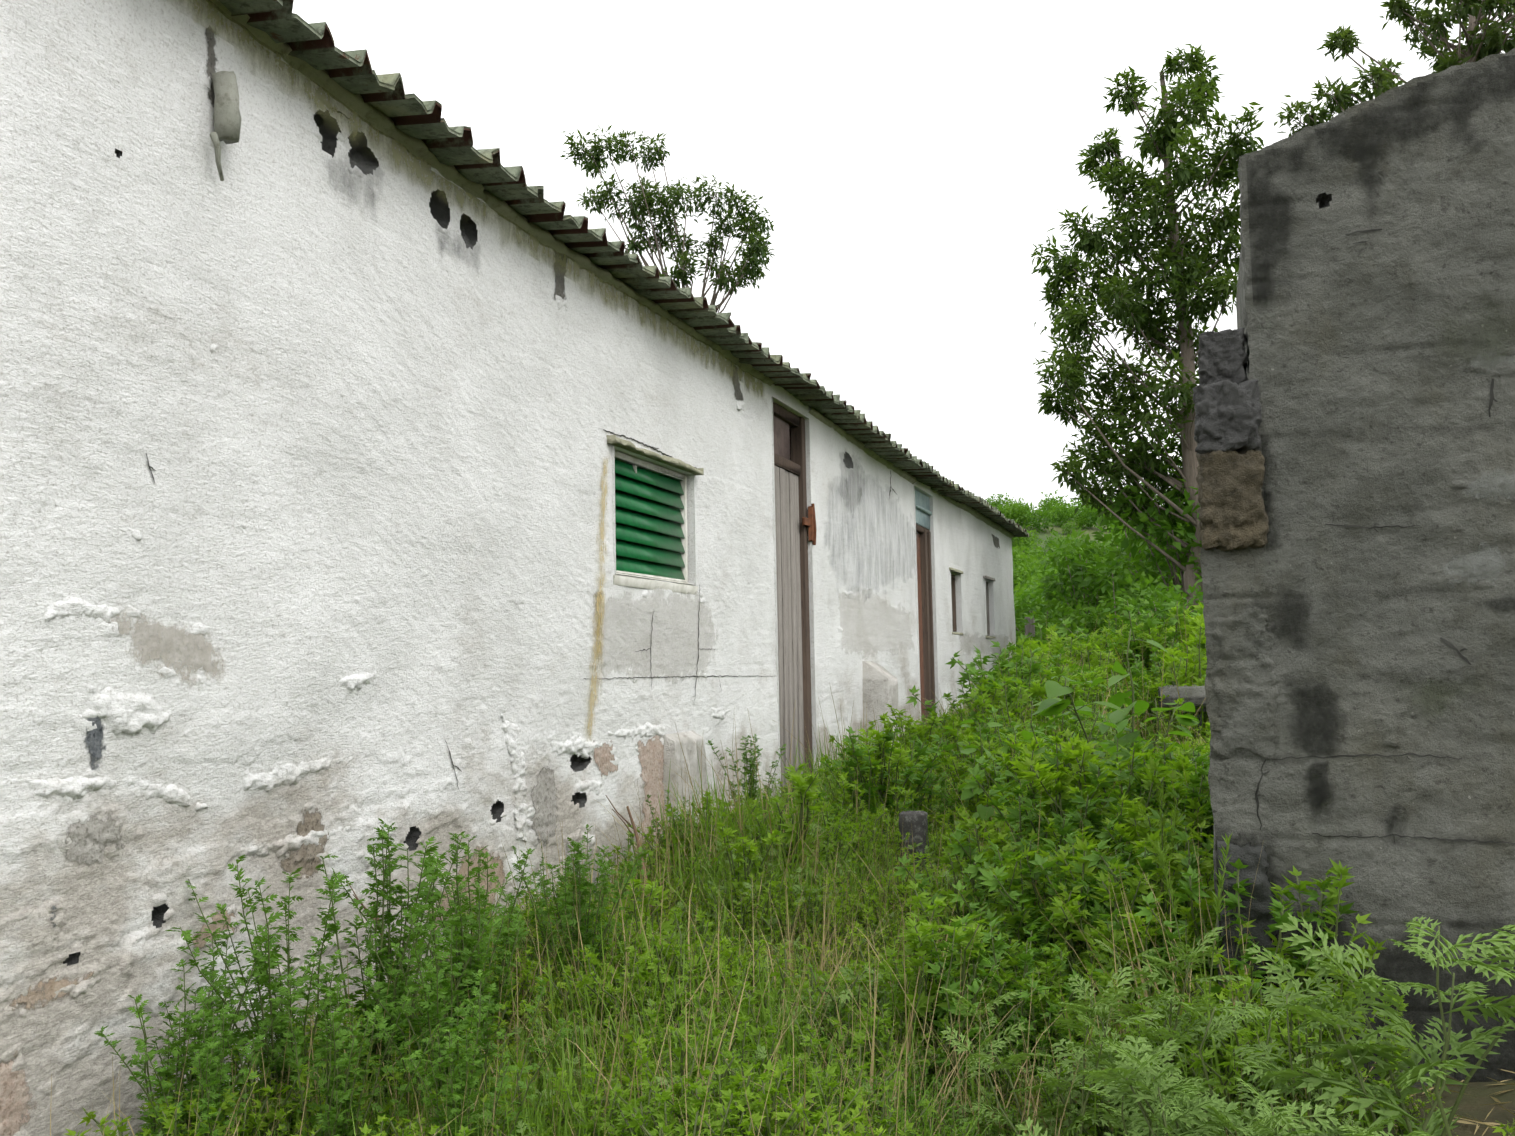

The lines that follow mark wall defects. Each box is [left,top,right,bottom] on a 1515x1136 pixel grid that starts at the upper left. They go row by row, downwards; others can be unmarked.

spalling [157,664,203,685]
spalling [70,709,106,778]
damp [1295,684,1336,807]
crack [1255,753,1462,830]
spalling [57,811,125,865]
spalling [281,803,330,890]
spalling [402,826,424,851]
spalling [44,898,68,928]
spalling [149,893,176,928]
spalling [192,903,244,948]
spalling [0,952,102,1020]
spalling [0,1040,32,1136]